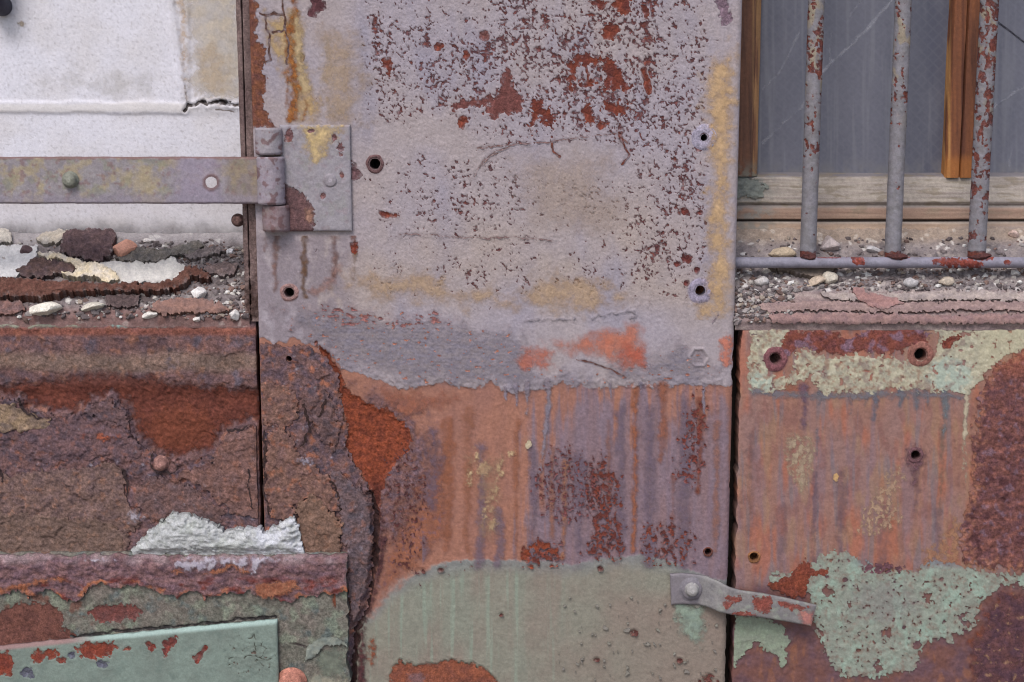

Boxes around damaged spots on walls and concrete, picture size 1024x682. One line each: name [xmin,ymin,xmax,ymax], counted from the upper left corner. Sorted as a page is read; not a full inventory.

crack [183,85,239,113]
rust [451,67,561,138]
rust [565,51,652,130]
spalling [0,228,13,246]
spalling [36,228,69,247]
rust [778,330,962,356]
peeling [746,329,1024,399]
rust [0,341,457,679]
rust [445,381,720,576]
rust [389,659,498,682]
peeling [733,615,791,668]
peeling [769,548,1024,680]